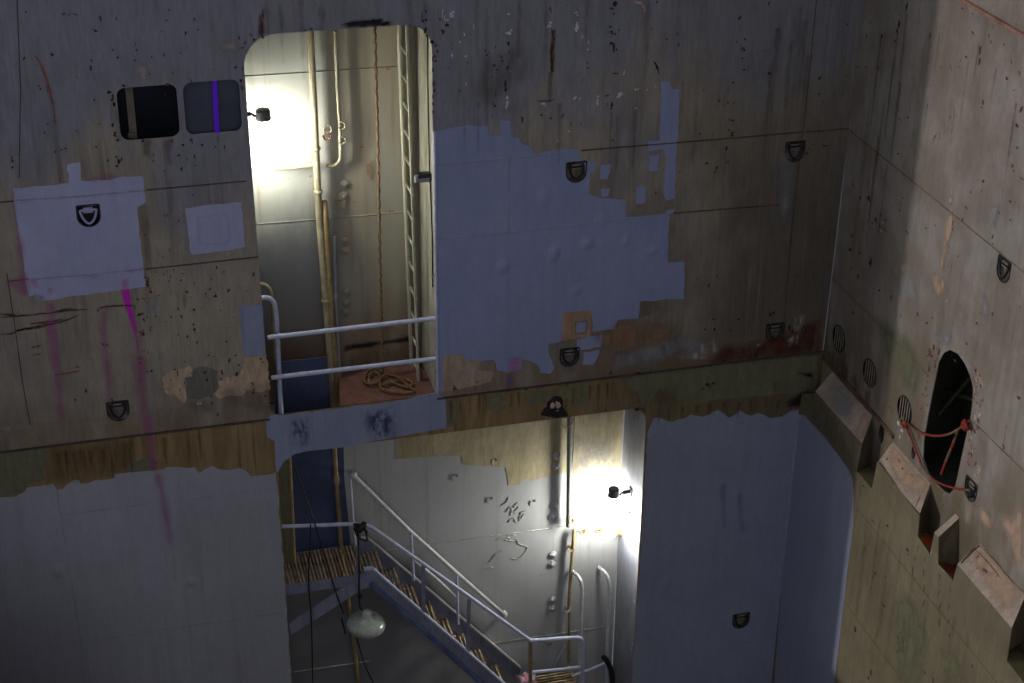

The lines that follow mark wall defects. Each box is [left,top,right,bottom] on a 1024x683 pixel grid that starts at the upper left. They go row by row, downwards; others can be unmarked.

peeling [162,366,201,405]
peeling [214,355,271,399]